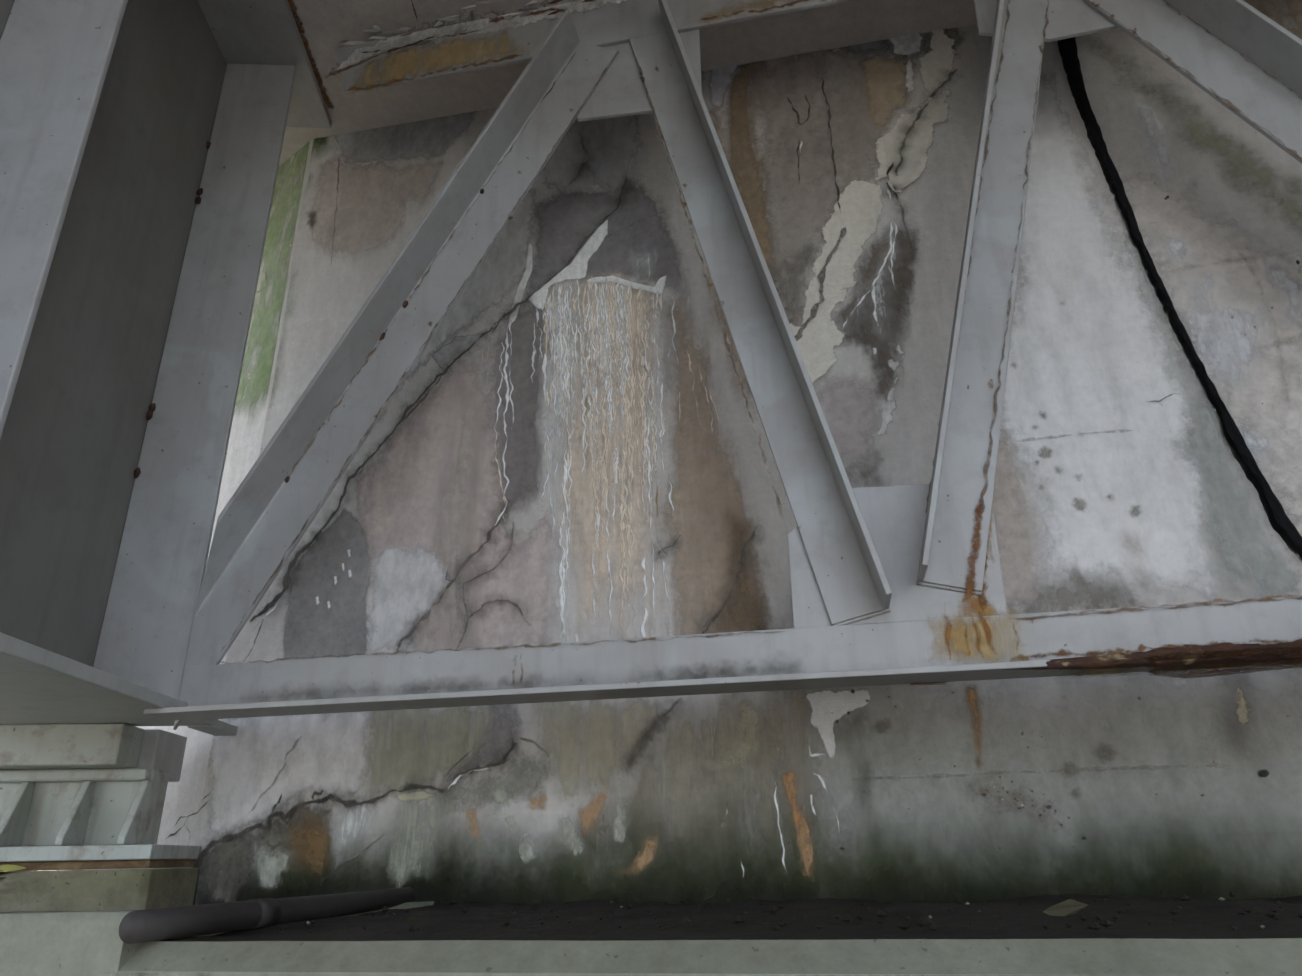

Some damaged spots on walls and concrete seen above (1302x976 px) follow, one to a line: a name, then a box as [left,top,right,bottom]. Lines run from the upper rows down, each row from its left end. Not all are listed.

peeling [337,0,627,72]
corrosion [980,0,1010,186]
peeling [790,28,956,383]
corrosion [253,505,319,604]
water stain [357,184,765,652]
corrosion [945,290,1011,660]
crack [166,738,549,868]
water stain [193,668,1302,906]
peeling [806,689,871,759]
corrosion [1011,618,1302,678]